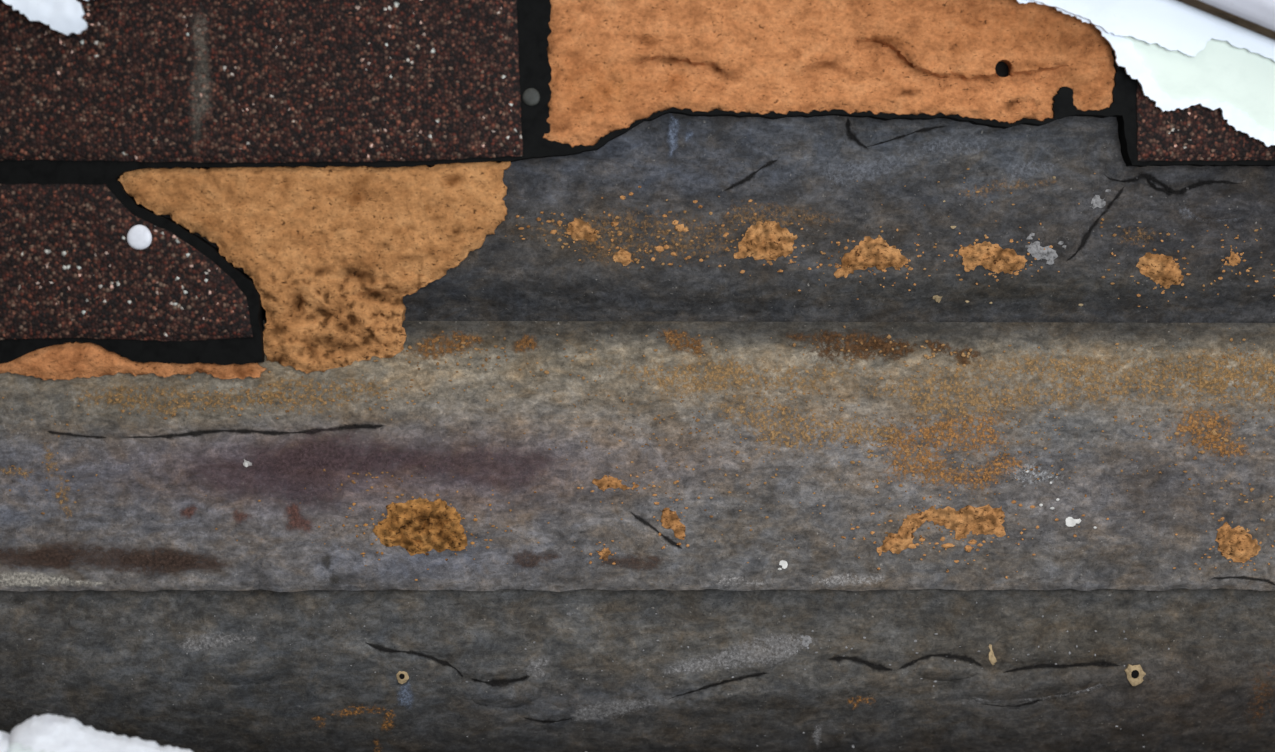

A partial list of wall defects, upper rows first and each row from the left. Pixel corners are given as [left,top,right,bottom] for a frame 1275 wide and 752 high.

peeling [1091,189,1111,209]
peeling [662,214,689,232]
crack [1067,174,1238,261]
peeling [651,245,703,266]
peeling [1010,233,1066,275]
crack [48,424,383,439]
peeling [1065,517,1097,529]
peeling [940,537,983,553]
damp [0,543,226,586]
crack [367,643,530,687]
crack [830,653,1119,673]
crack [670,673,766,699]